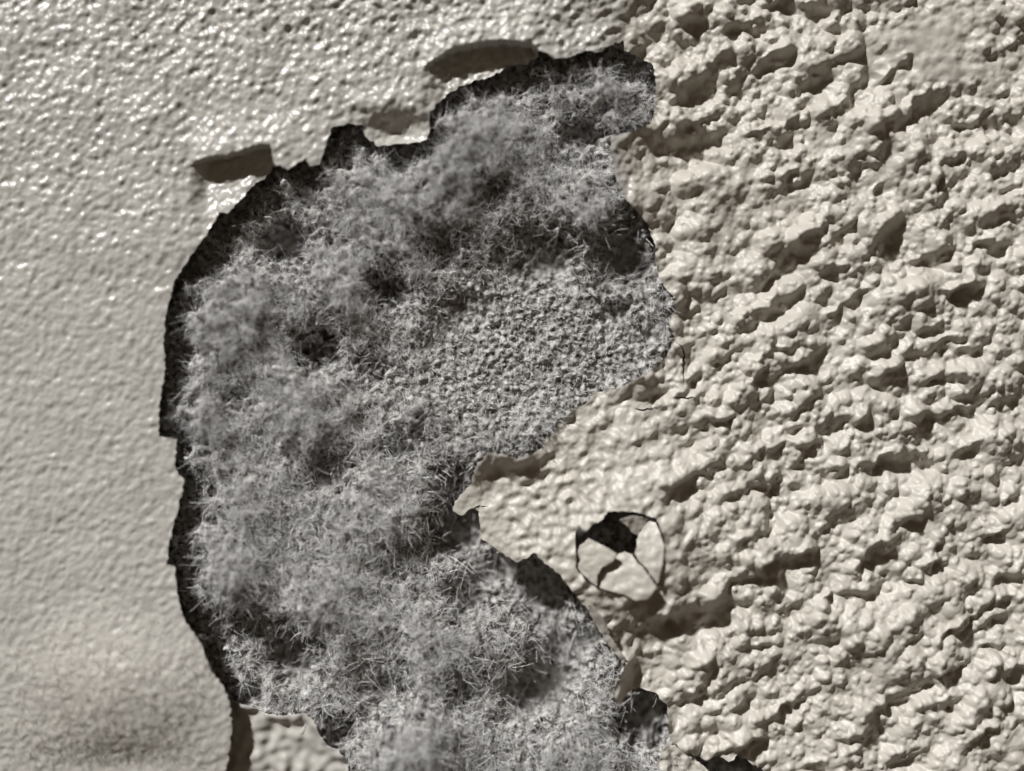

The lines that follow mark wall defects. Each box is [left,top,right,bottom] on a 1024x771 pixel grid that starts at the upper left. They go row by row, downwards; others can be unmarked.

flaking render [158,40,717,771]